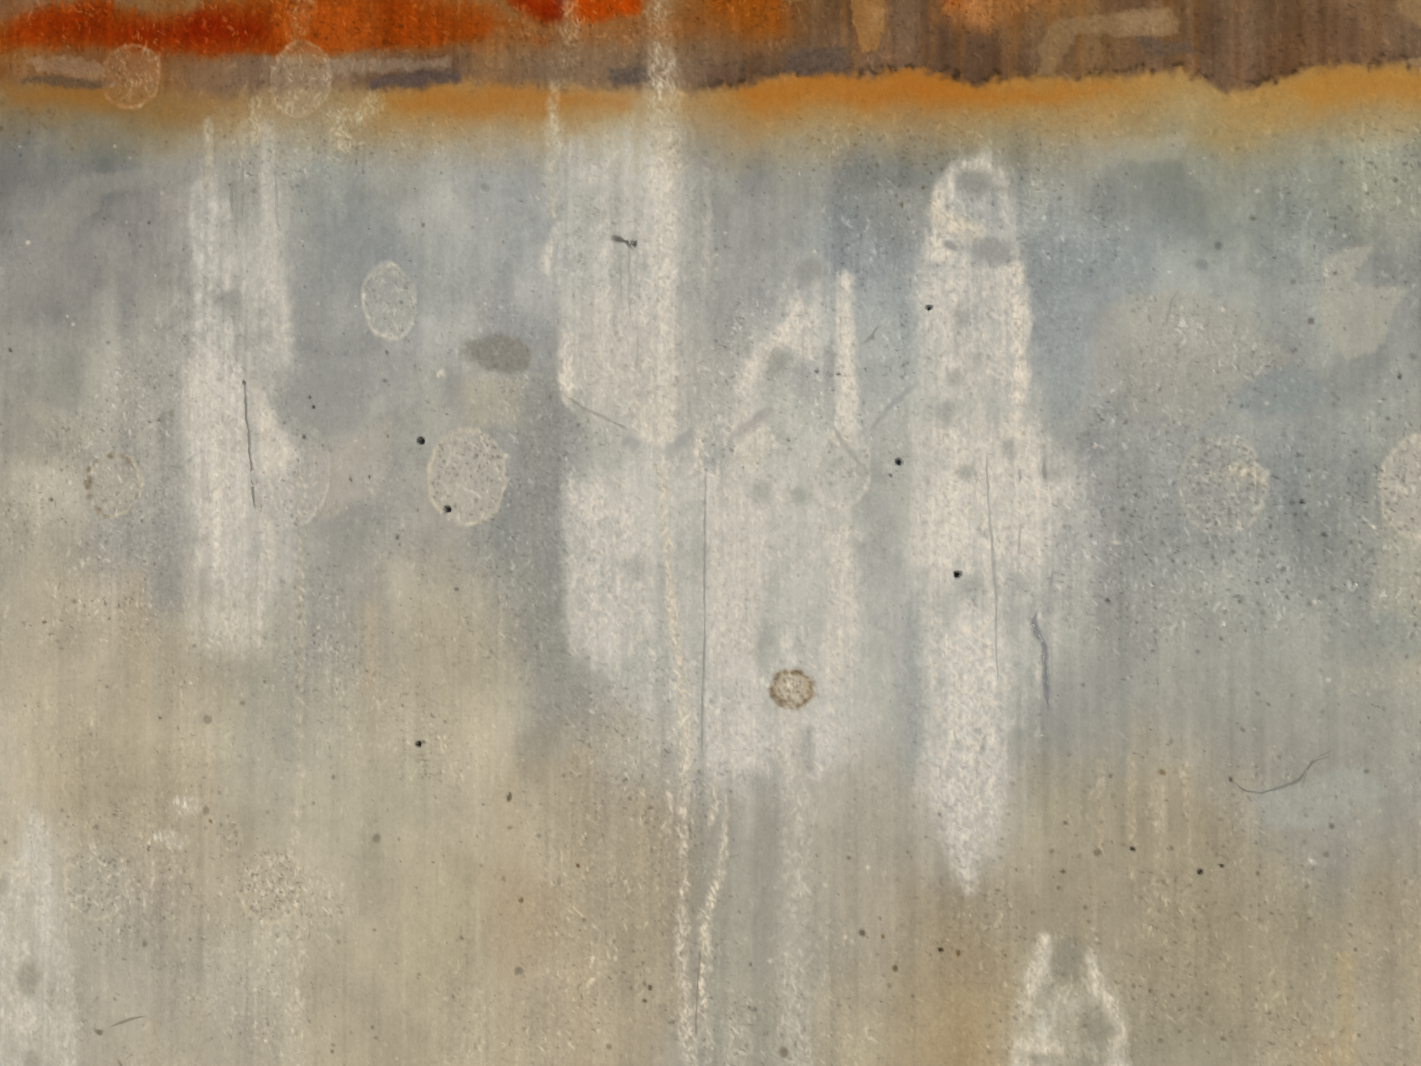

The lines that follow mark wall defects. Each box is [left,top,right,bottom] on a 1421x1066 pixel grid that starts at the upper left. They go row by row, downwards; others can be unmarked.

rust [0,0,290,67]
rust [307,0,556,59]
rust [579,0,638,32]
rust [681,0,806,65]
rust [927,0,1082,45]
damp [0,58,102,98]
rust [0,84,643,179]
rust [683,69,1421,179]
damp [131,59,316,870]
damp [320,0,1421,1066]